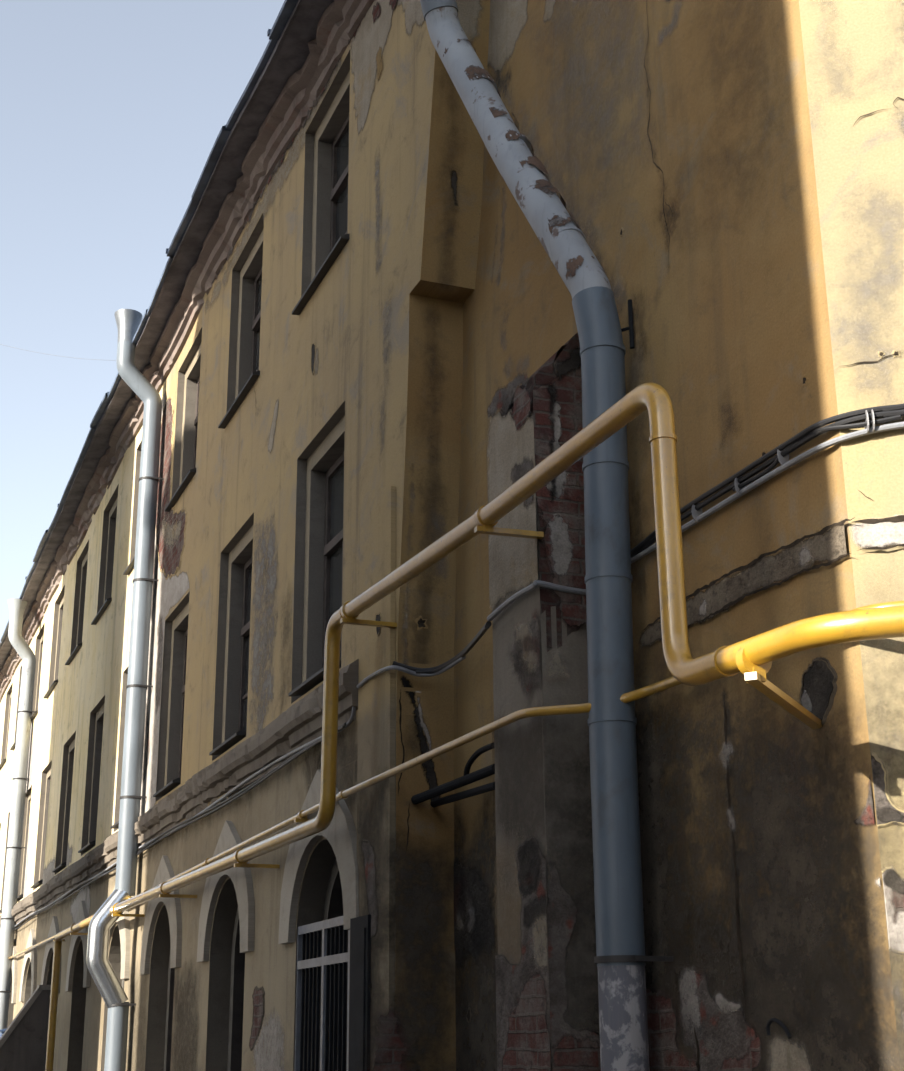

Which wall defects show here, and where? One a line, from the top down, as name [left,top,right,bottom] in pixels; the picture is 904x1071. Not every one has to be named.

crack [644,4,672,243]
flaking render [487,347,583,503]
flaking render [140,393,189,816]
crack [398,676,440,853]
flaking render [488,458,587,628]
spalling [800,657,838,726]
spalling [852,515,904,547]
leakage [359,792,498,1071]
spalling [453,837,601,1071]
leakage [544,756,600,1037]
flaking render [646,970,811,1071]
spalling [876,866,904,955]